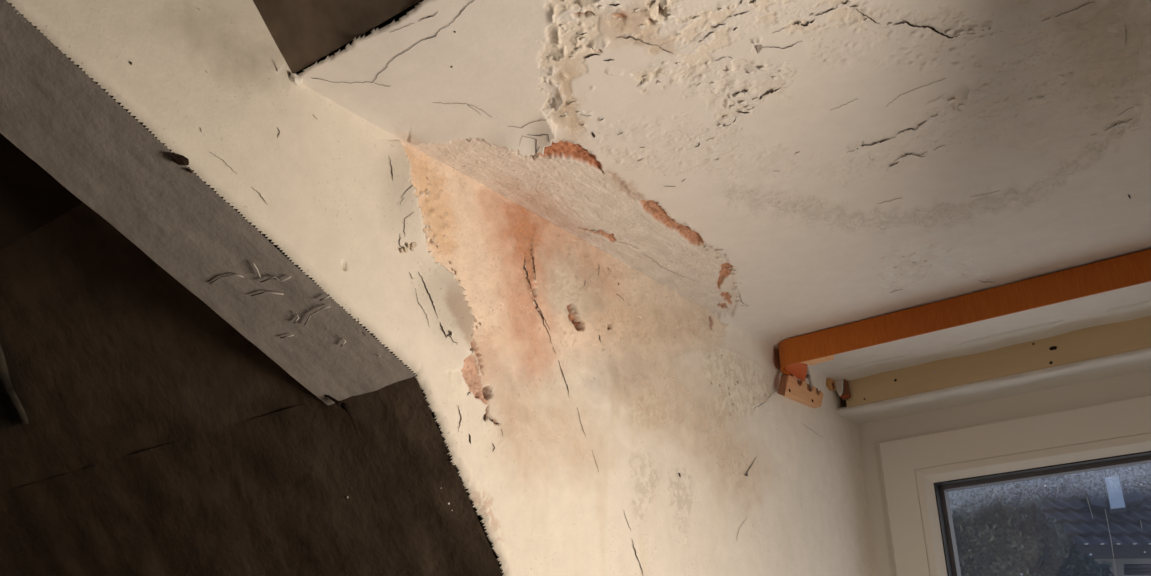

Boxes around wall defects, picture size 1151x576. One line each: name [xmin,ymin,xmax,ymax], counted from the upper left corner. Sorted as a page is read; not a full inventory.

crack [312,1,473,87]
crack [704,0,756,61]
crack [760,3,990,50]
crack [848,116,944,167]
spalling [395,0,1151,404]